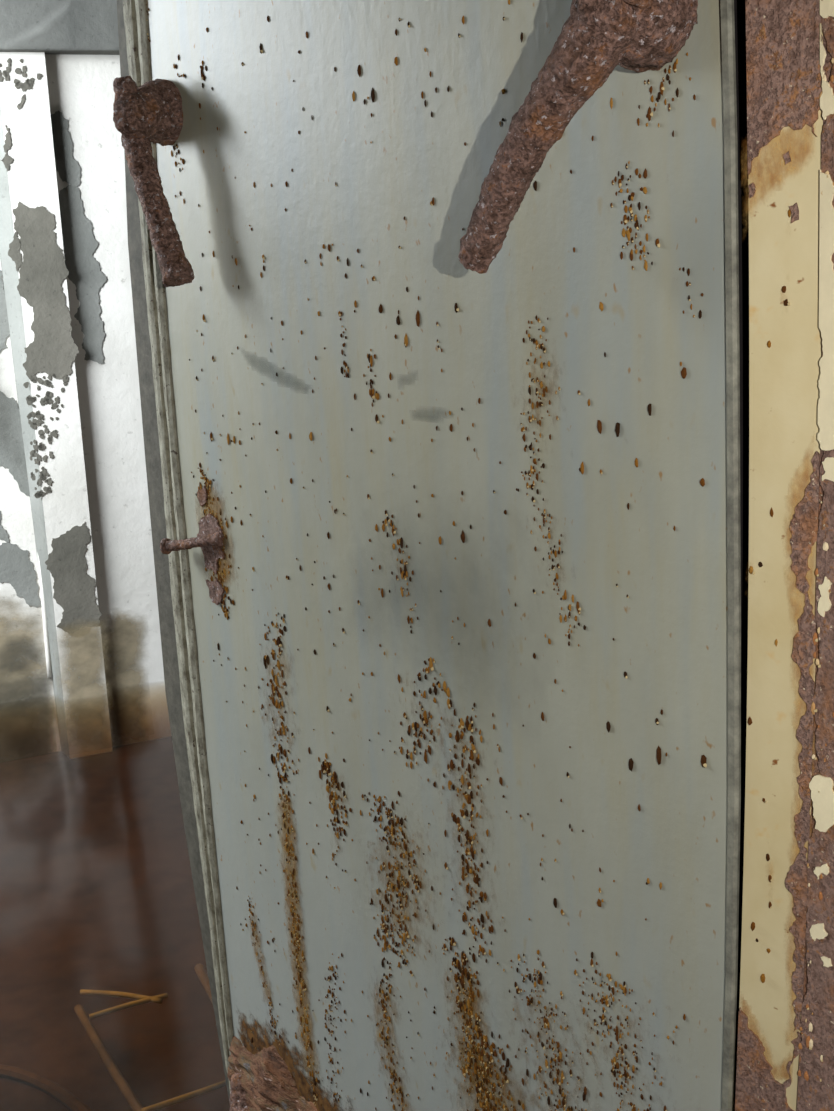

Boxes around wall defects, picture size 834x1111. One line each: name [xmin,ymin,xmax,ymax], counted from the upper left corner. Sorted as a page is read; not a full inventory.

peeling [0,58,42,110]
corrosion [745,0,834,207]
peeling [0,111,107,498]
corrosion [394,287,420,347]
corrosion [788,203,799,223]
peeling [817,170,834,482]
peeling [0,513,101,633]
corrosion [191,411,260,620]
corrosion [516,315,586,646]
peeling [817,577,832,617]
corrosion [236,612,686,1111]
peeling [809,775,834,832]